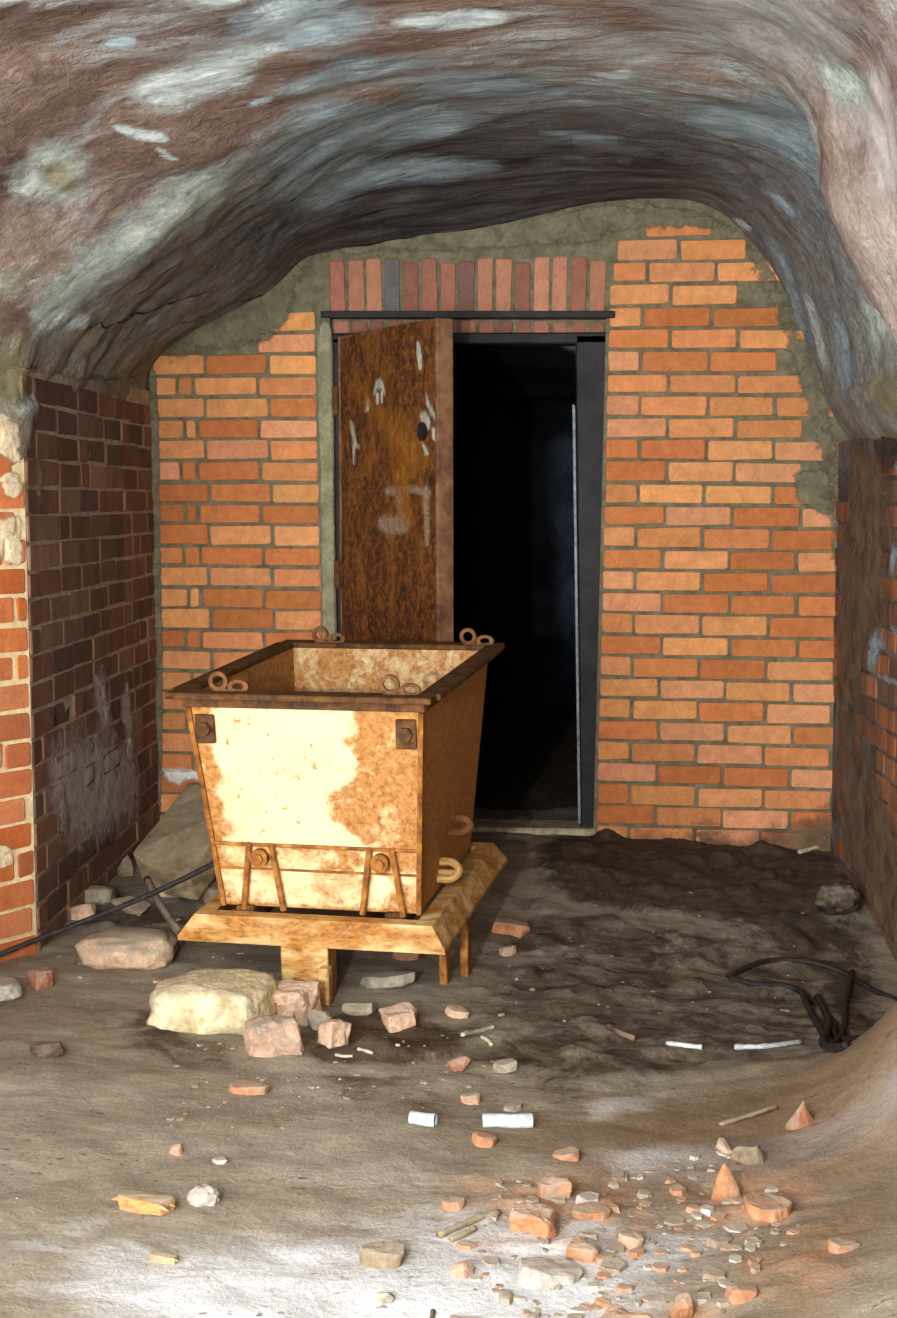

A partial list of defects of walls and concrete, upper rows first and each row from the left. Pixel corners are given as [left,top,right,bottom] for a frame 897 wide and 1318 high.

damp [396,10,504,30]
damp [338,60,566,99]
damp [597,70,636,79]
damp [114,125,176,160]
damp [543,130,618,141]
damp [770,192,795,217]
damp [768,238,827,368]